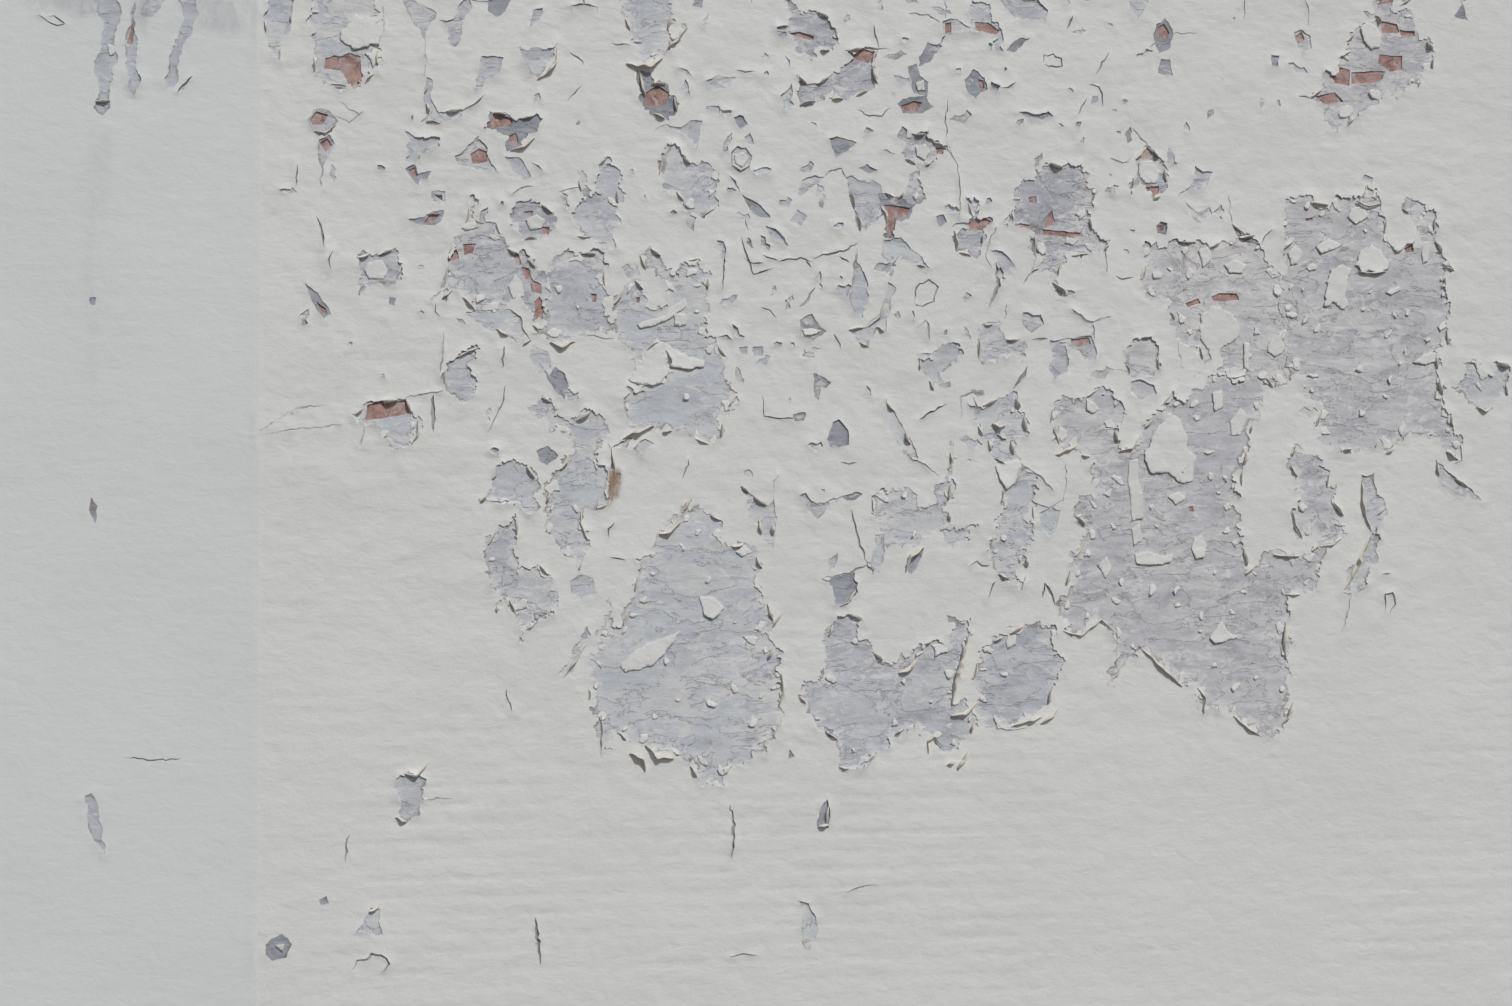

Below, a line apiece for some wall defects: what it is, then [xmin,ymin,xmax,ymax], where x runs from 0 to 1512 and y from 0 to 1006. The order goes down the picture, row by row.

peeling [93,0,198,115]
peeling [260,0,1510,787]
peeling [394,764,452,823]